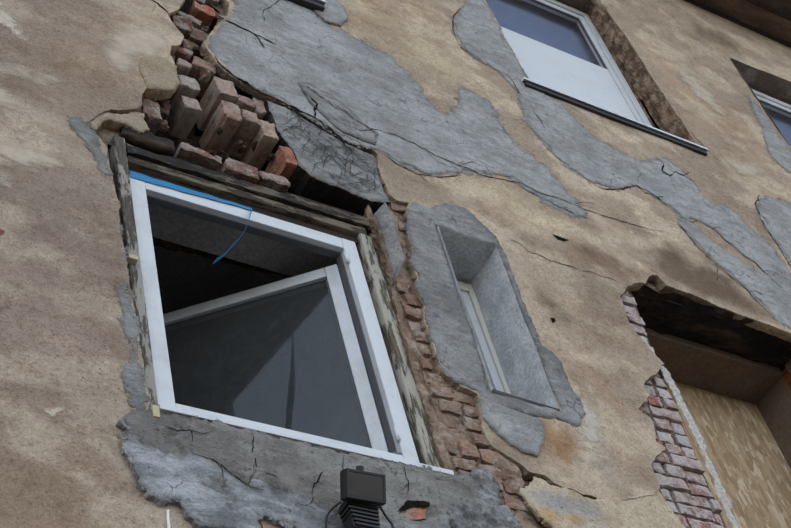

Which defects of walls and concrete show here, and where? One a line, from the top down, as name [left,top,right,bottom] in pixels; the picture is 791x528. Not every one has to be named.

peeling [106,27,167,70]
crack [216,0,279,47]
crack [213,55,790,310]
spalling [119,0,739,528]
crack [167,426,323,506]